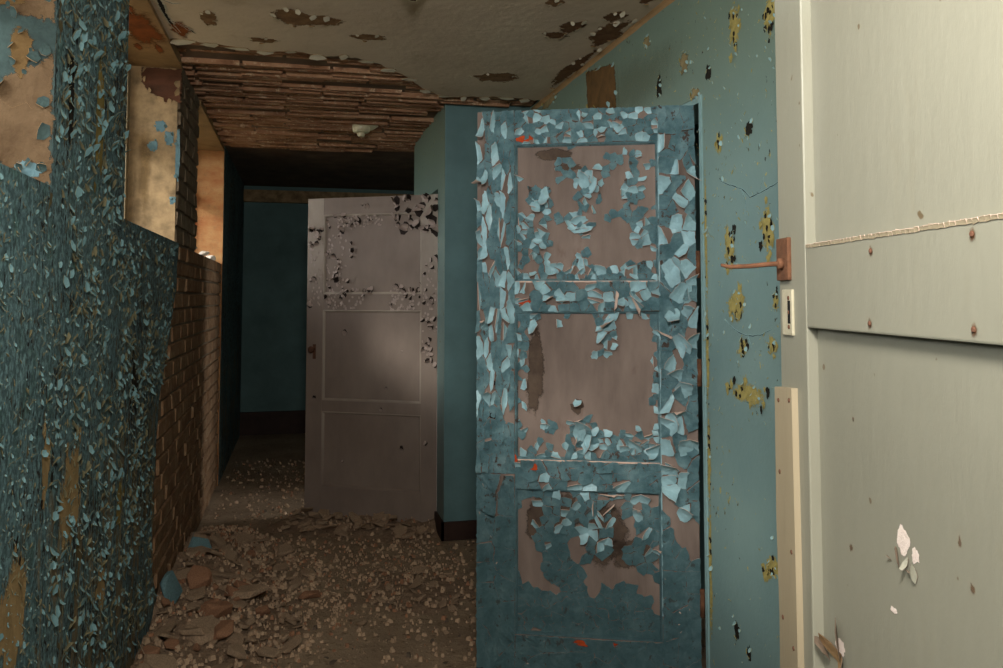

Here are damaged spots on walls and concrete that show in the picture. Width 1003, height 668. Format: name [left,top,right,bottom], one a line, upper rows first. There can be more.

flaking render [0,0,221,668]
peeling [307,193,439,311]
peeling [388,254,438,368]
peeling [469,0,779,668]
spalling [771,287,781,321]
spalling [886,524,919,584]
spalling [814,618,845,668]